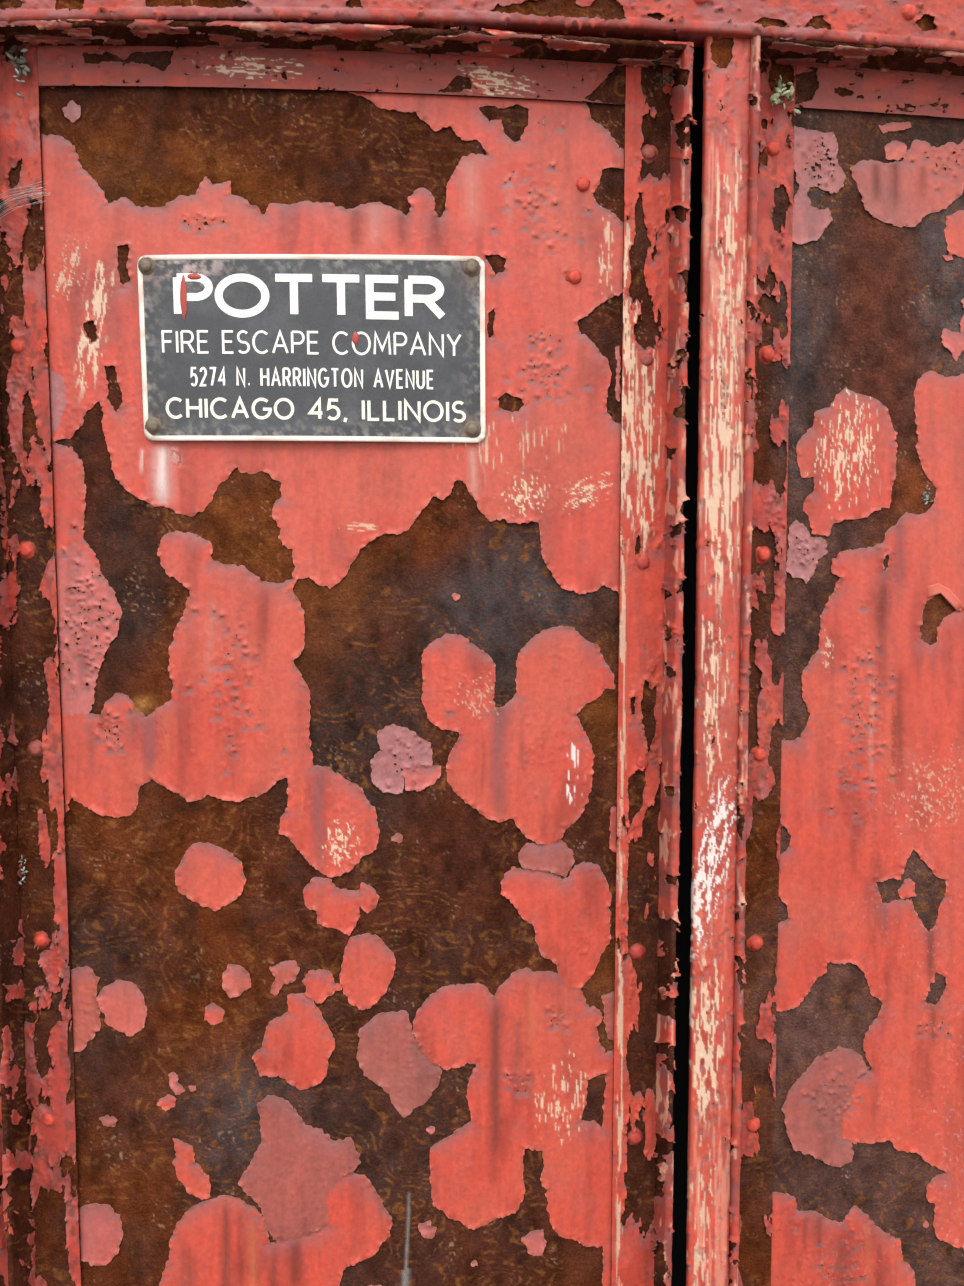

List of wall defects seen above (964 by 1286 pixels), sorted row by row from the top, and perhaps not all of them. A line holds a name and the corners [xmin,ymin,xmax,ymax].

corrosion [40,87,487,218]
peeling [0,0,691,350]
peeling [749,15,964,149]
peeling [740,266,789,497]
corrosion [782,71,964,740]
peeling [0,160,79,1286]
corrosion [55,402,619,1286]
peeling [615,662,677,1286]
peeling [725,522,791,1286]
corrosion [773,962,964,1286]
corrosion [876,850,946,965]
peeling [920,594,955,645]